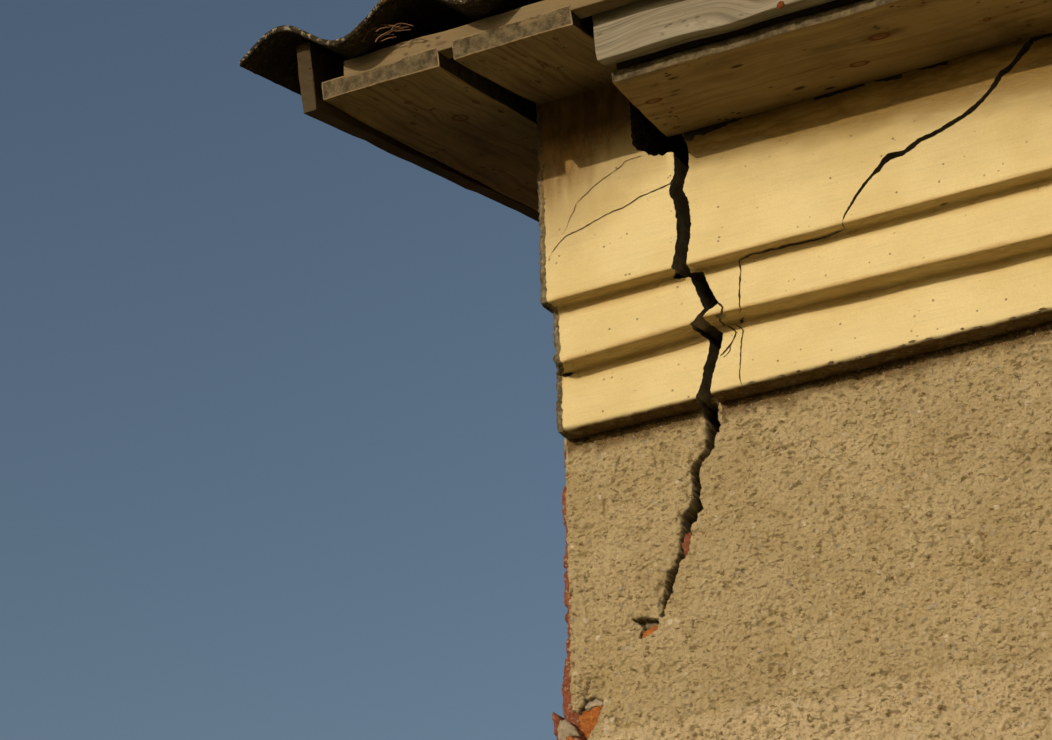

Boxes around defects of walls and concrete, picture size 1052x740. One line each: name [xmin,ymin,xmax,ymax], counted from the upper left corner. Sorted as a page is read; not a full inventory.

crack [548,40,1032,413]
spalling [536,104,603,740]
crack [682,532,692,556]